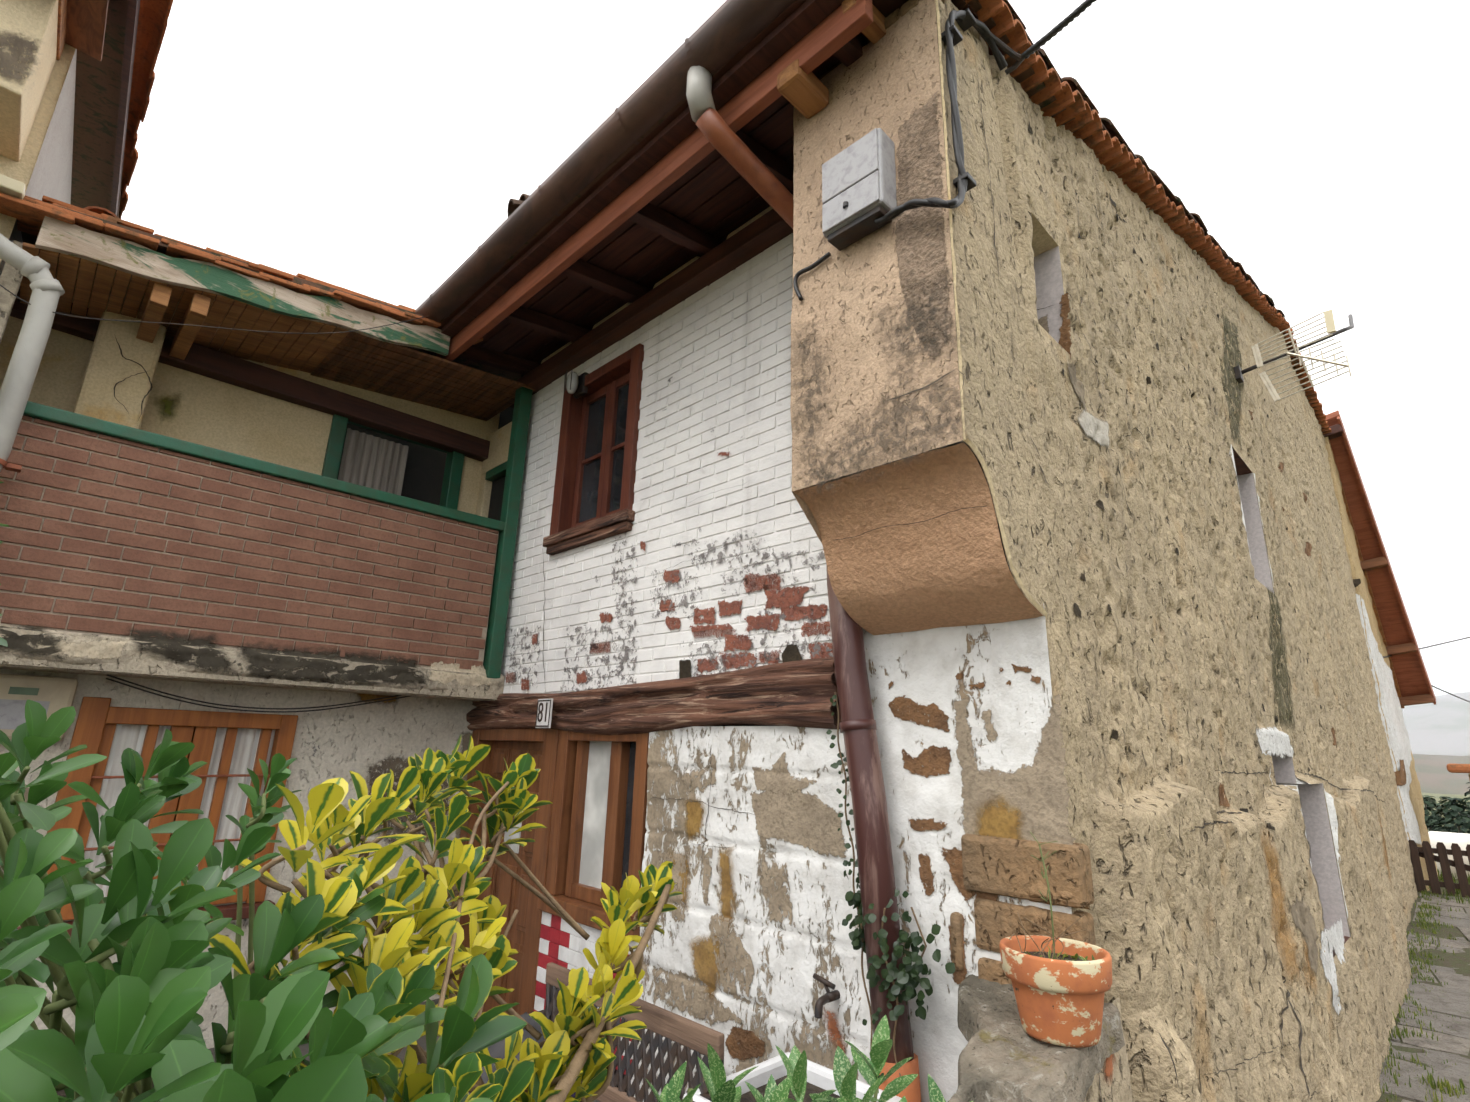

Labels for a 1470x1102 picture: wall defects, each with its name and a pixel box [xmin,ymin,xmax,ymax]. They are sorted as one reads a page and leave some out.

damp [0,32,38,81]
damp [0,626,62,658]
damp [129,630,426,686]
peeling [560,612,637,691]
peeling [650,527,833,679]
damp [368,755,450,843]
flaking render [750,752,847,858]
flaking render [888,672,1075,984]
crack [1188,810,1242,832]
crack [1215,770,1385,802]
peeling [757,859,795,928]
peeling [652,848,765,1061]